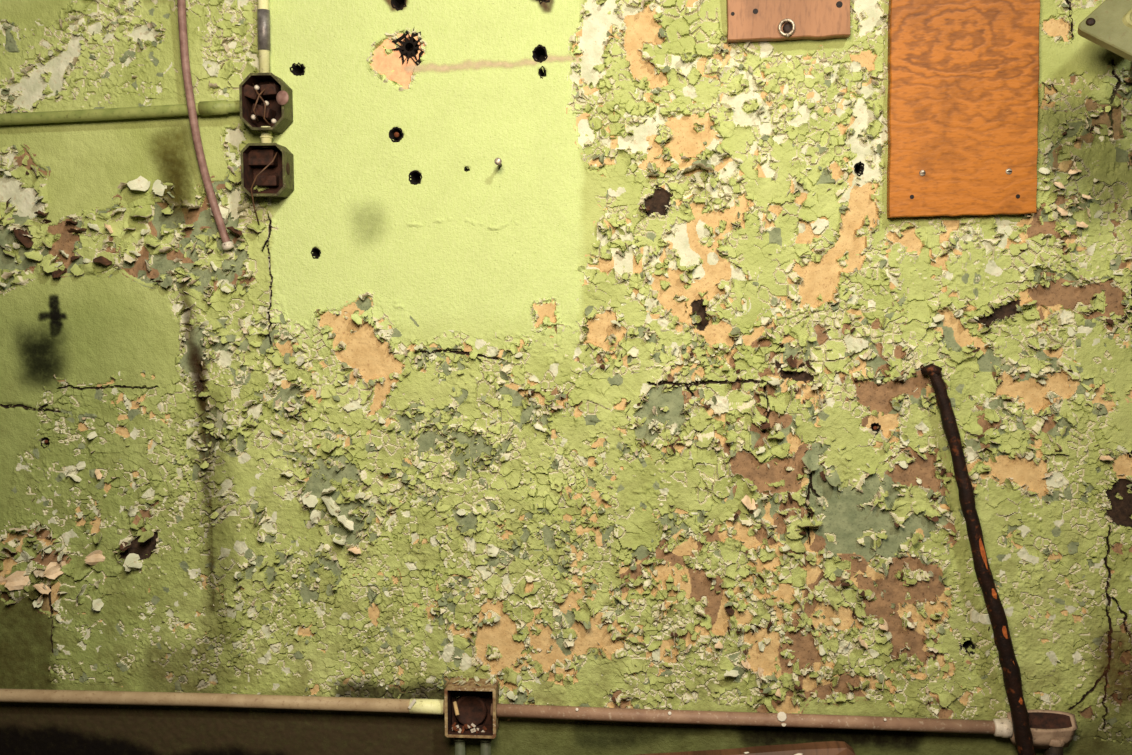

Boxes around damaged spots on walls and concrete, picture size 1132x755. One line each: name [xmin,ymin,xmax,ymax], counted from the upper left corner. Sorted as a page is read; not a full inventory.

peeling [0,0,271,114]
spalling [667,113,718,173]
peeling [845,111,888,187]
spalling [793,182,884,309]
spalling [651,268,704,327]
crack [0,385,157,413]
spalling [855,370,931,415]
peeling [907,64,1132,746]
spalling [729,443,812,497]
peeling [809,465,926,562]
spalling [875,556,945,609]
crack [1069,526,1131,729]